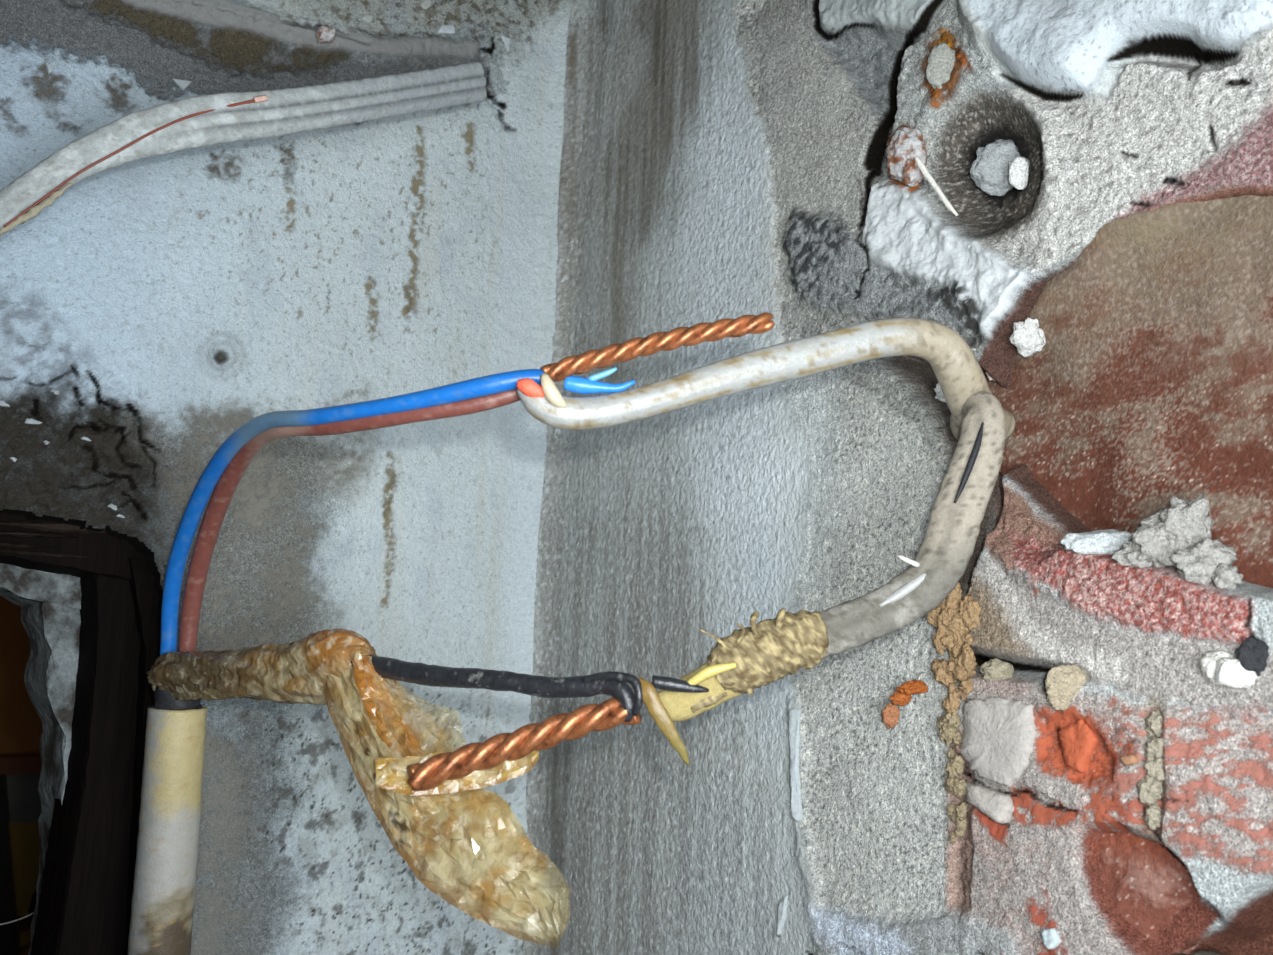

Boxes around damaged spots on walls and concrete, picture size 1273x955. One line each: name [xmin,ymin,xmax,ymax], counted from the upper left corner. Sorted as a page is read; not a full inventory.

flaking render [814,25,906,114]
corrosion [923,30,970,107]
flaking render [997,27,1273,274]
crack [0,367,158,520]
flaking render [780,367,945,612]
flaking render [788,583,1273,942]
flaking render [776,895,788,937]
spalling [1027,891,1066,955]